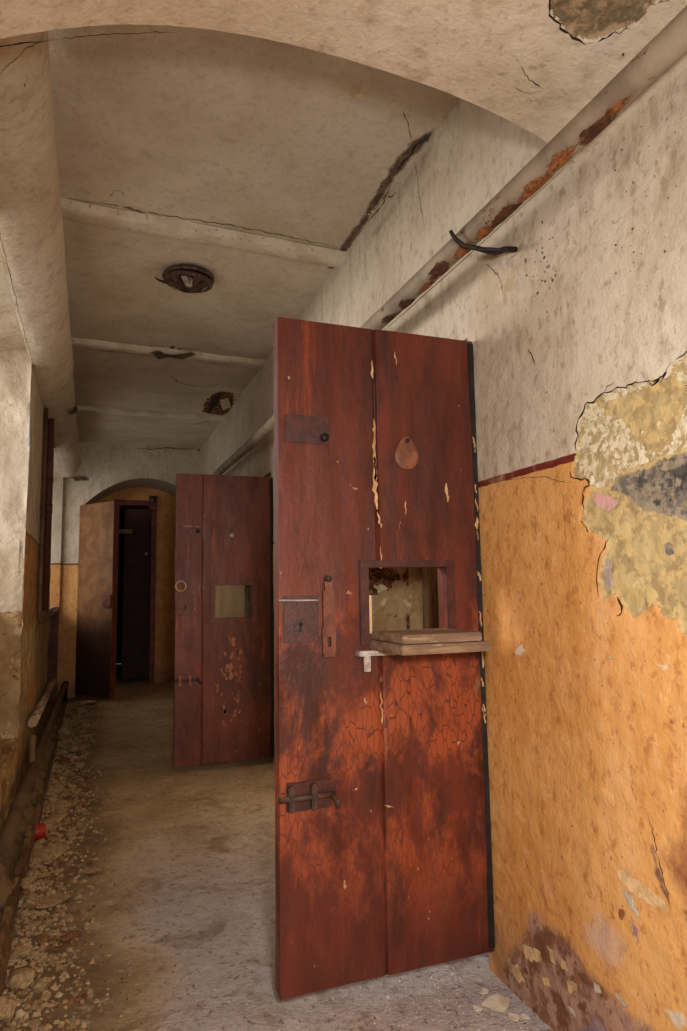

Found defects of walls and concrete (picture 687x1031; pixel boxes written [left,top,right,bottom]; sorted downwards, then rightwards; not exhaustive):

crack [0,31,176,74]
flaking render [549,0,669,45]
rust [381,86,641,325]
flaking render [570,351,687,634]
leakage [496,892,666,1031]